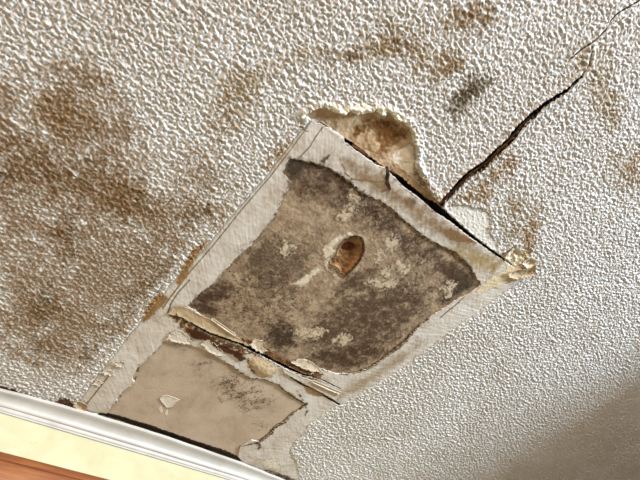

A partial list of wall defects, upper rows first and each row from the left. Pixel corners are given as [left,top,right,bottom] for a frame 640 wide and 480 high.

leakage [27,291,65,327]
leakage [48,212,75,258]
leakage [0,149,152,217]
crack [163,121,340,405]
leakage [190,155,502,371]
peeling [188,158,538,374]
peeling [301,102,439,204]
crack [344,0,640,265]
peeling [107,330,306,456]